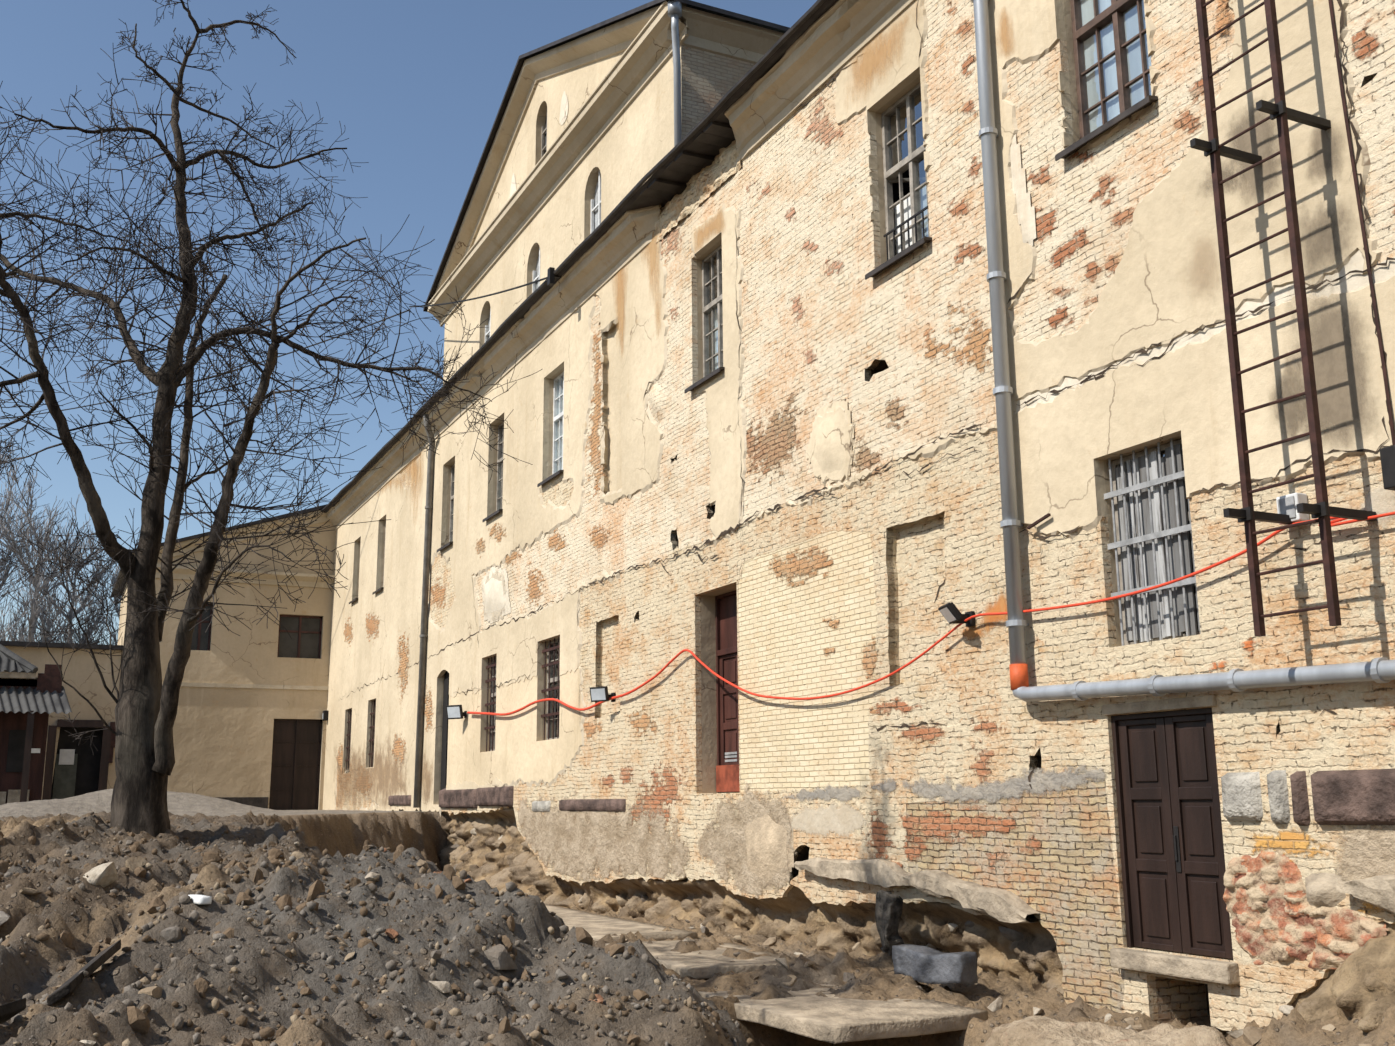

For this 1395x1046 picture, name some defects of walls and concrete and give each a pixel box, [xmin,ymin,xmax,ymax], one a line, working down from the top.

leakage [1222,109,1277,194]
leakage [1312,129,1337,174]
leakage [1305,211,1343,269]
crack [341,0,1395,700]
leakage [1274,304,1364,441]
peeling [420,0,1395,1037]
spalling [397,633,409,704]
spalling [392,733,406,767]
peeling [148,868,281,955]
peeling [207,984,220,1011]